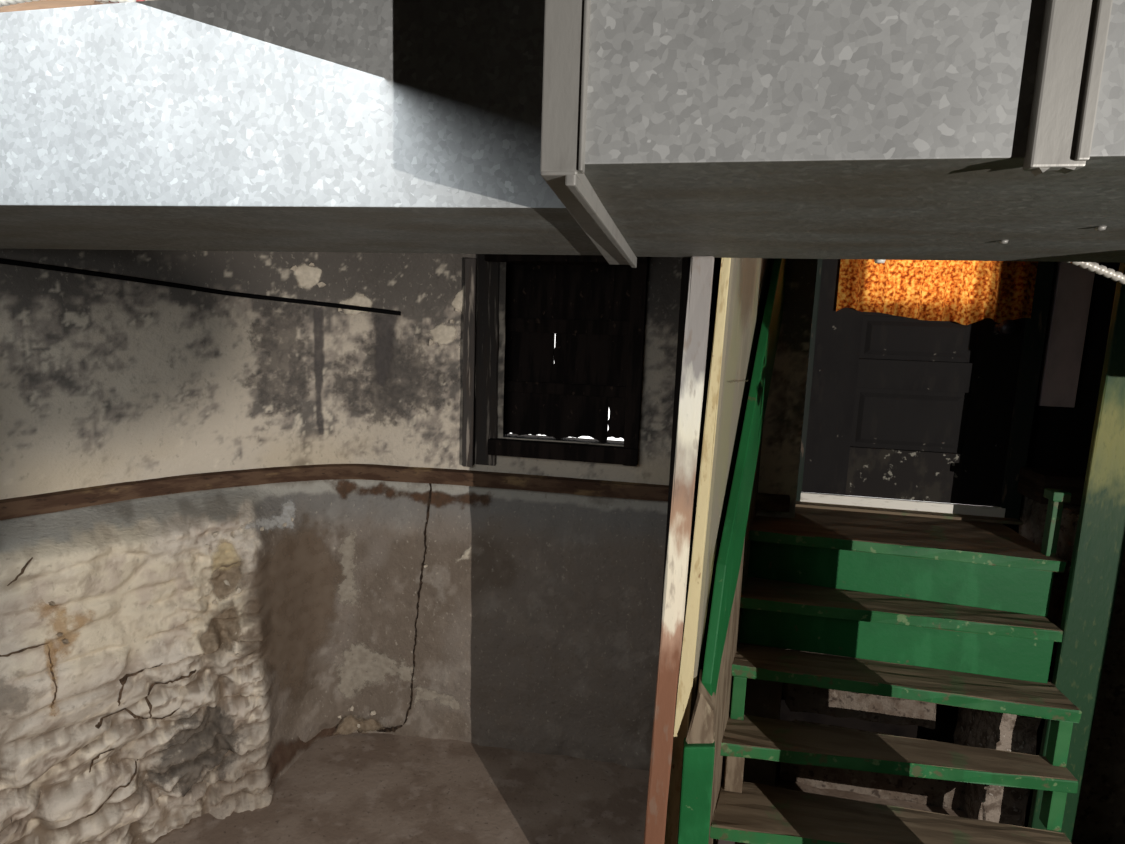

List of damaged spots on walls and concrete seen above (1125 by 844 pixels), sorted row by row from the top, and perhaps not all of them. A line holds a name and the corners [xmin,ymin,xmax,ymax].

damp [245,304,459,434]
crack [7,557,33,586]
crack [335,483,432,733]
crack [0,643,57,716]
crack [82,663,196,819]